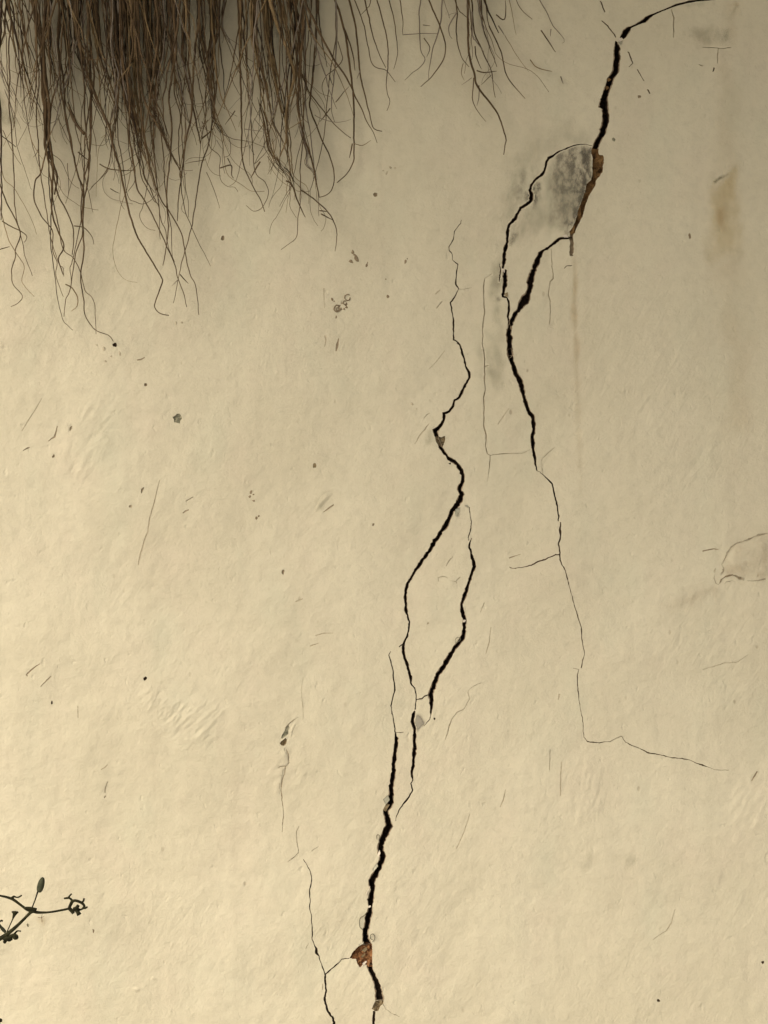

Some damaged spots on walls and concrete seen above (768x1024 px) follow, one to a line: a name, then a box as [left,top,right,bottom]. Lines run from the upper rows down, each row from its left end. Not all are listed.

crack [278,0,715,1024]